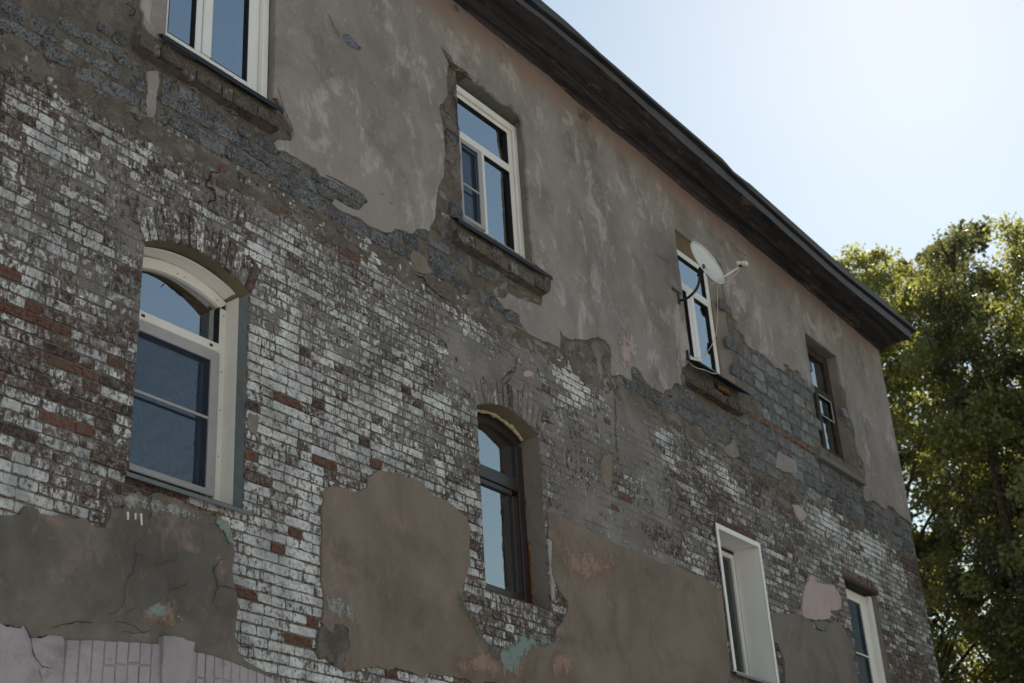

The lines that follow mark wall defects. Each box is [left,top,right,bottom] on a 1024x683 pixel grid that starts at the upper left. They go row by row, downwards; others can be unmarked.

spalling [0,0,917,562]
crack [24,497,188,683]
peeling [800,575,841,620]